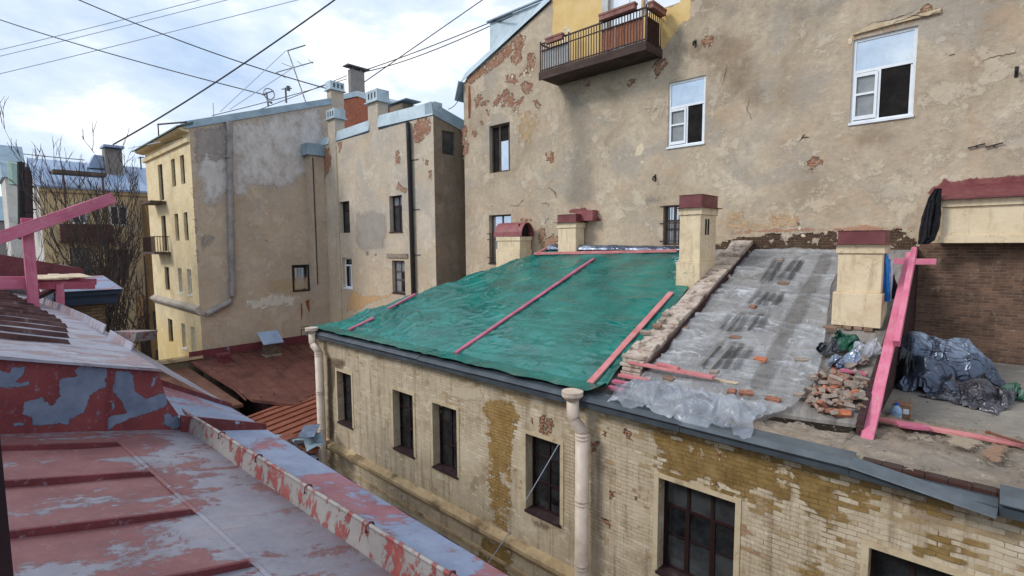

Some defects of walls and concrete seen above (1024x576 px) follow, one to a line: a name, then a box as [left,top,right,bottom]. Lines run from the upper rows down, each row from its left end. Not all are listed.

flaking render [847,3,942,44]
flaking render [461,33,541,159]
flaking render [413,117,431,143]
flaking render [803,156,824,171]
flaking render [715,211,917,250]
peeling [0,366,29,388]
peeling [13,366,181,430]
spalling [530,415,554,434]
spalling [947,434,1009,462]